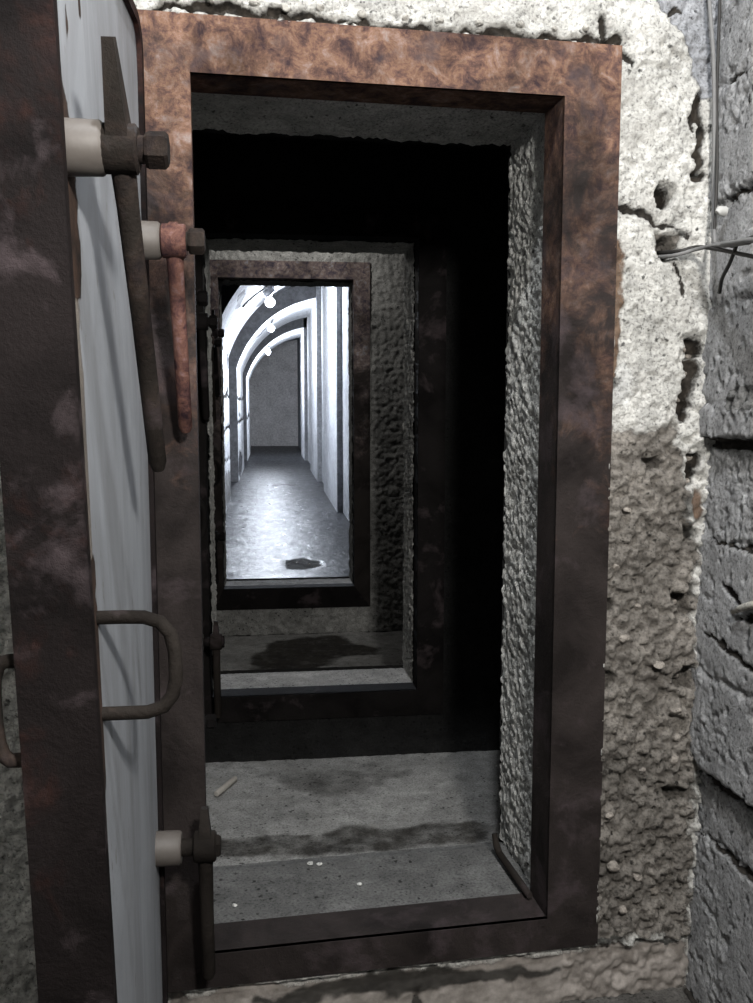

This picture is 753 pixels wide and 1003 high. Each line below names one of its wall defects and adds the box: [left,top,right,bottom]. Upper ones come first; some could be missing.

leakage [250,635,378,670]